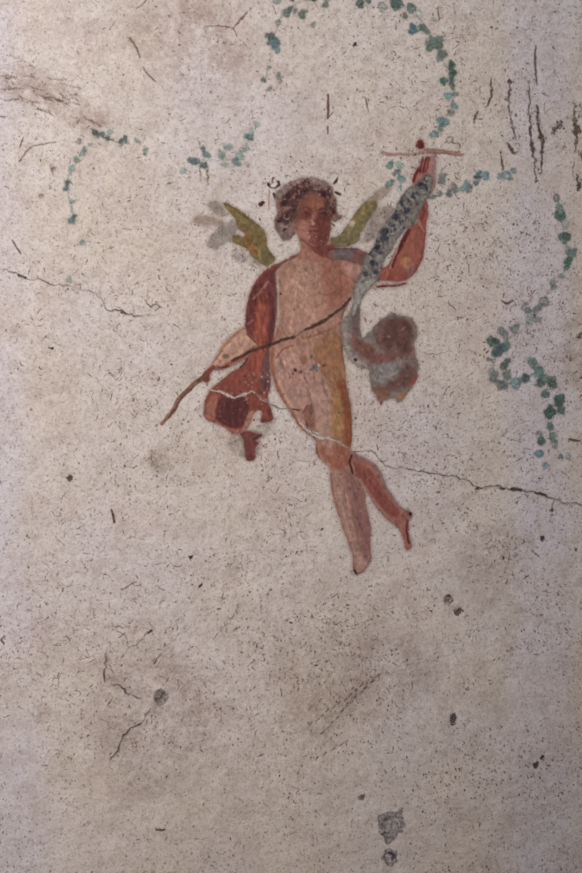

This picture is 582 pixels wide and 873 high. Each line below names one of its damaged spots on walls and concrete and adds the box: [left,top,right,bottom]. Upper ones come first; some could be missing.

crack [0,269,160,318]
crack [211,390,582,509]
crack [102,625,153,760]
spalling [377,808,405,866]